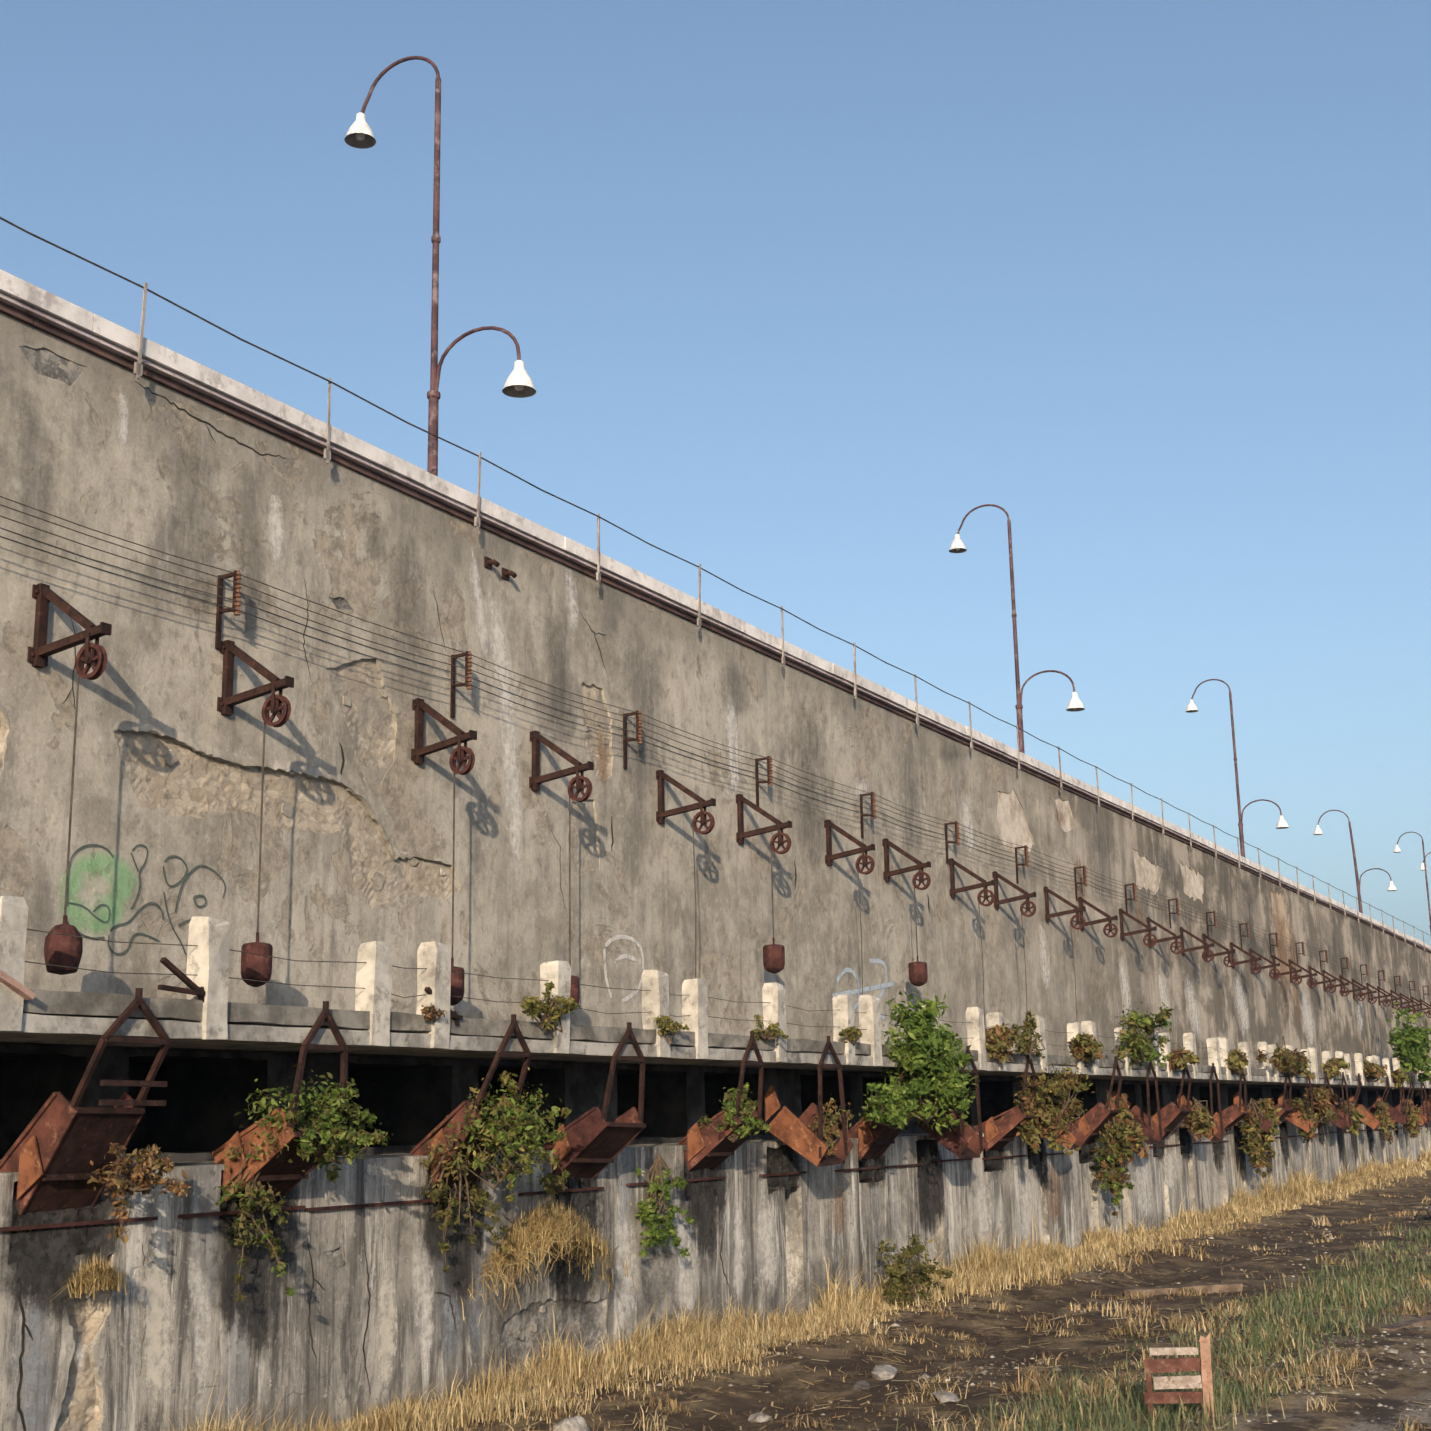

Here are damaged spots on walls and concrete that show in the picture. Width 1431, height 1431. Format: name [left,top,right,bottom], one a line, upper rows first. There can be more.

flaking render [113,659,461,908]
flaking render [996,790,1035,857]
flaking render [1133,849,1163,895]
flaking render [1180,862,1204,903]
crack [17,1298,33,1431]
leakage [1,1188,118,1431]
spalling [55,1252,110,1431]
leakage [137,1255,176,1402]
leakage [188,1187,297,1382]
leakage [378,1269,398,1383]
leakage [413,1173,487,1358]
leakage [547,1176,636,1328]